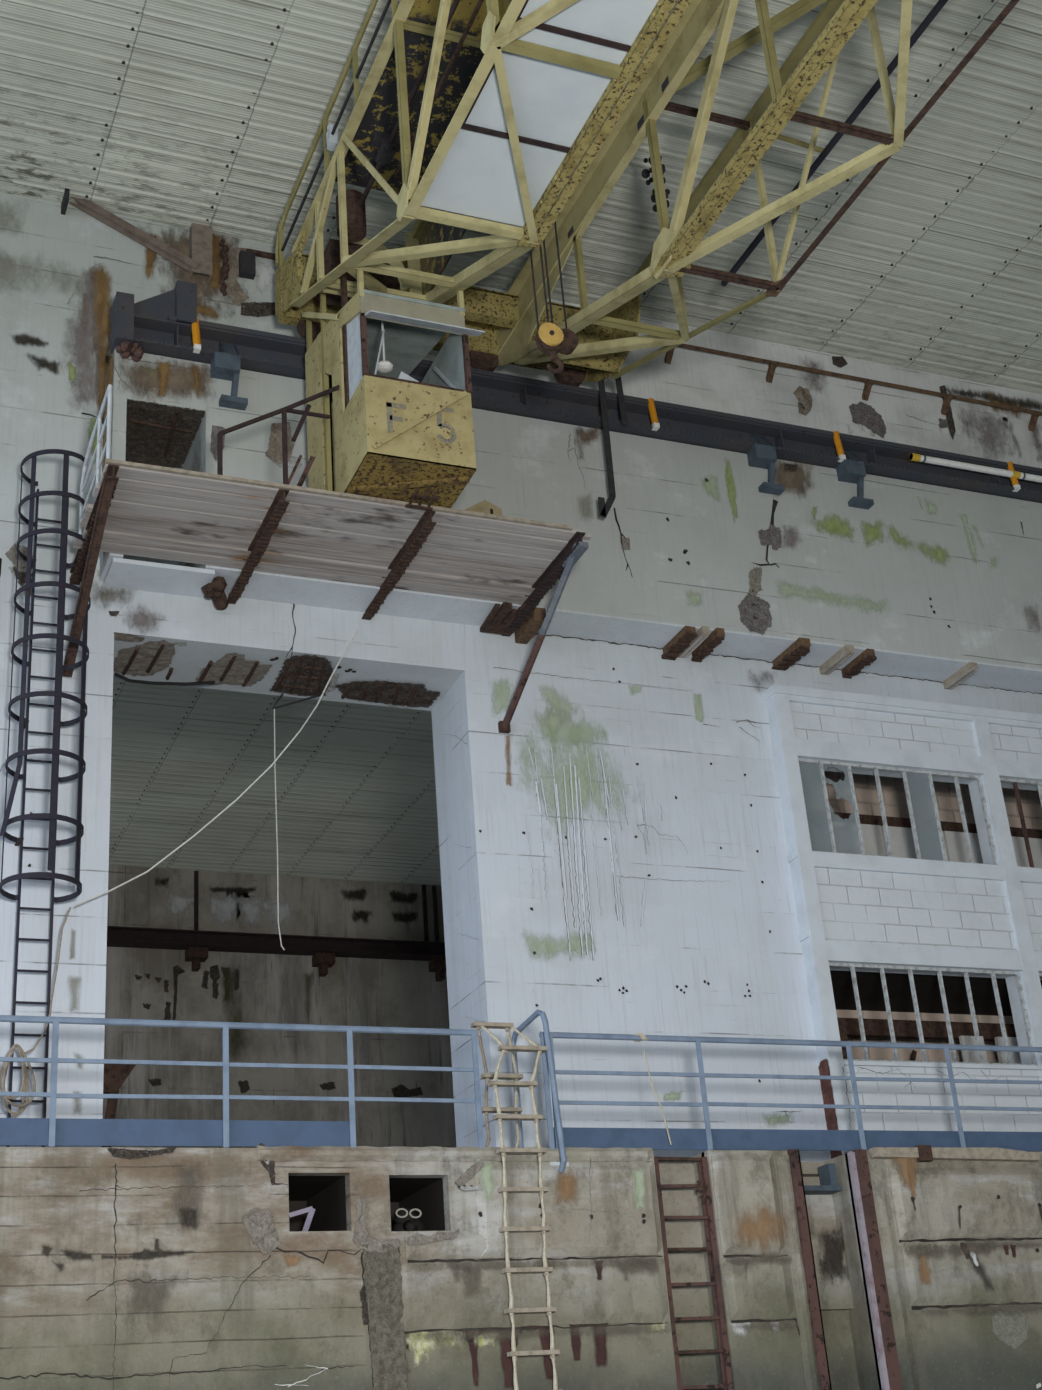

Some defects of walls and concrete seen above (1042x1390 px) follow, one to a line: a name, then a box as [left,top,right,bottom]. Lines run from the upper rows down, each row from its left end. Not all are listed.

spalling [848,401,886,438]
spalling [738,593,772,635]
spalling [109,611,187,680]
spalling [195,653,441,709]
spalling [242,1208,281,1255]
crack [0,1158,669,1388]
corrosion [465,1323,607,1388]